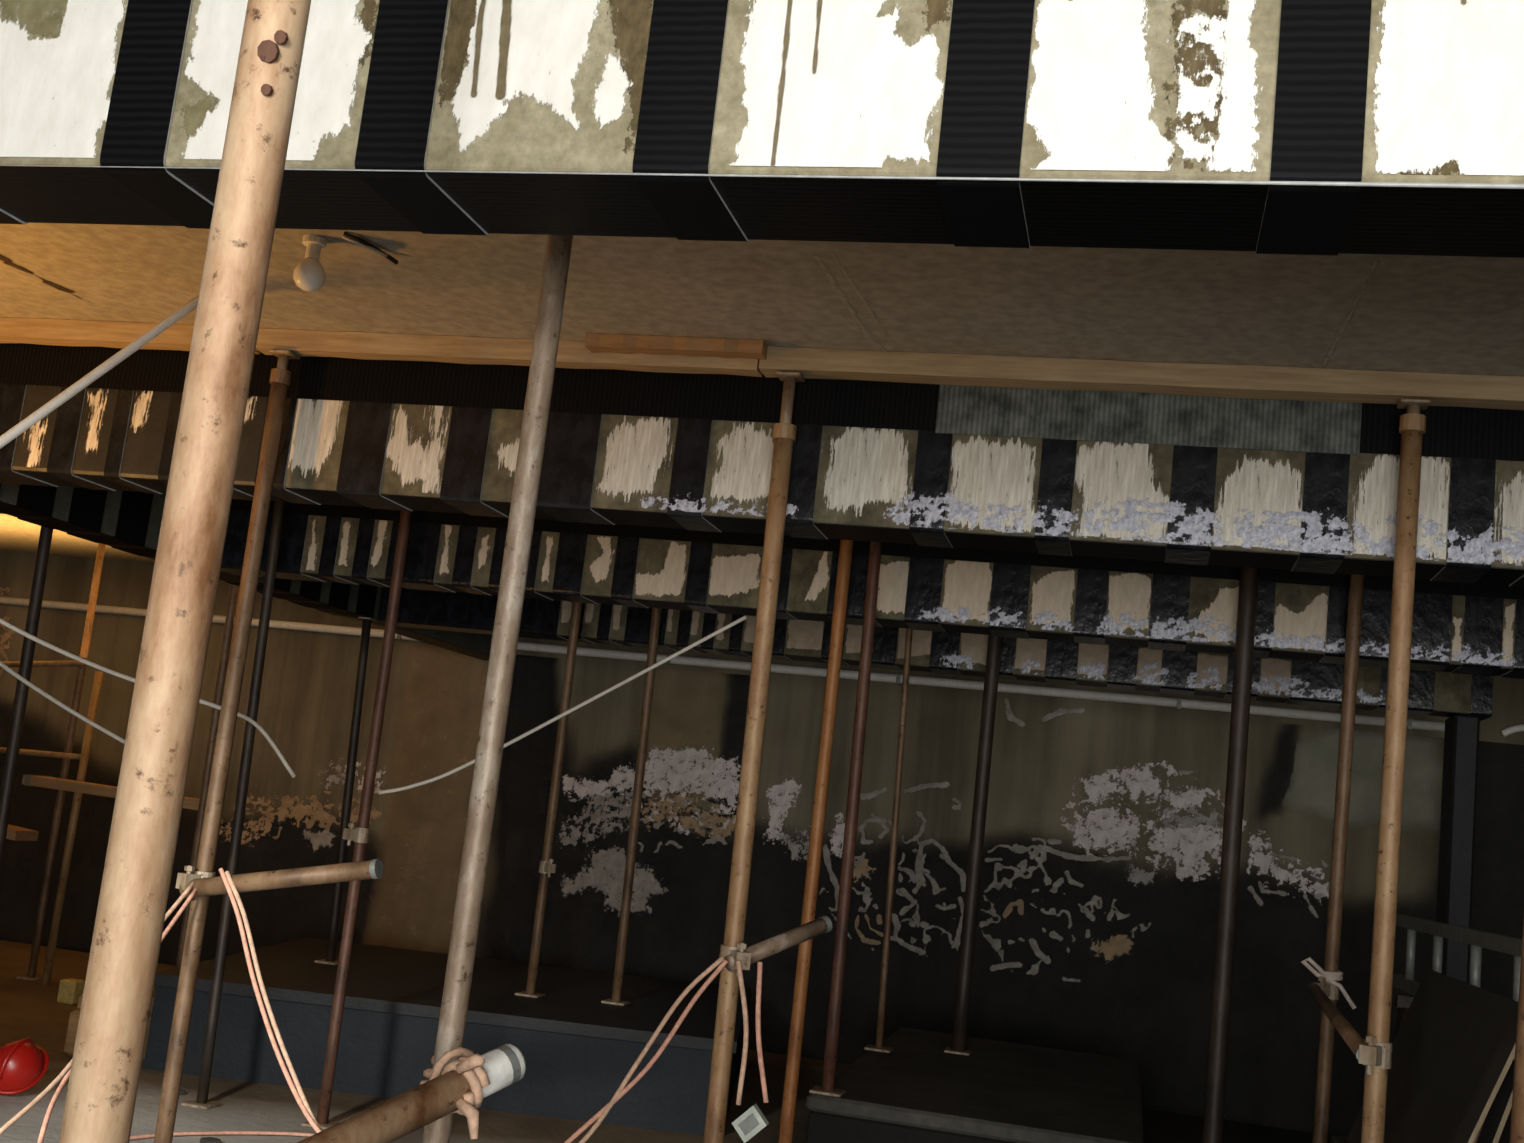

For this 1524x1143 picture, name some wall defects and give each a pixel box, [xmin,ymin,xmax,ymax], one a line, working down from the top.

peeling [0,0,128,158]
peeling [438,0,652,153]
peeling [1026,0,1263,172]
crack [0,255,81,299]
leakage [480,654,750,985]
peeling [762,760,1225,975]
leakage [1260,724,1297,814]
peeling [1242,819,1330,918]
leakage [1469,741,1524,999]
leakage [742,828,1220,1116]
leakage [1223,873,1374,1137]
leakage [1389,873,1438,1043]